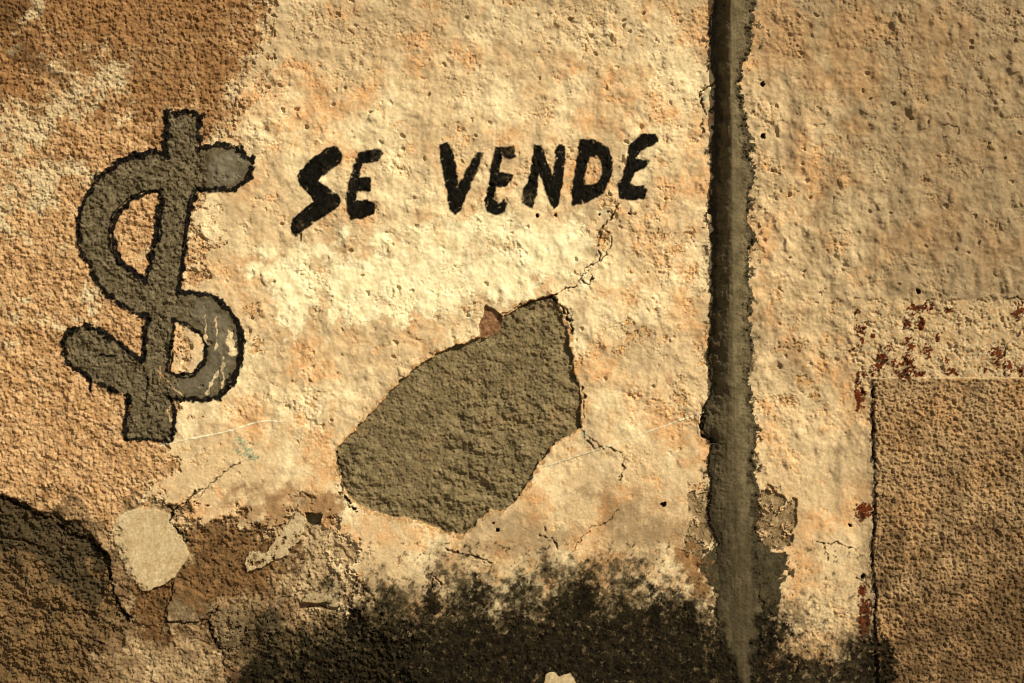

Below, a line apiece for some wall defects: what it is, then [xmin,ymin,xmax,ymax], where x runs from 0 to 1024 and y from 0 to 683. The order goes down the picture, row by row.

crack [502,204,619,334]
spalling [333,292,592,540]
peeling [244,509,322,572]
peeling [756,484,797,551]
peeling [167,596,214,623]
peeling [299,577,338,608]
damp [130,517,899,683]